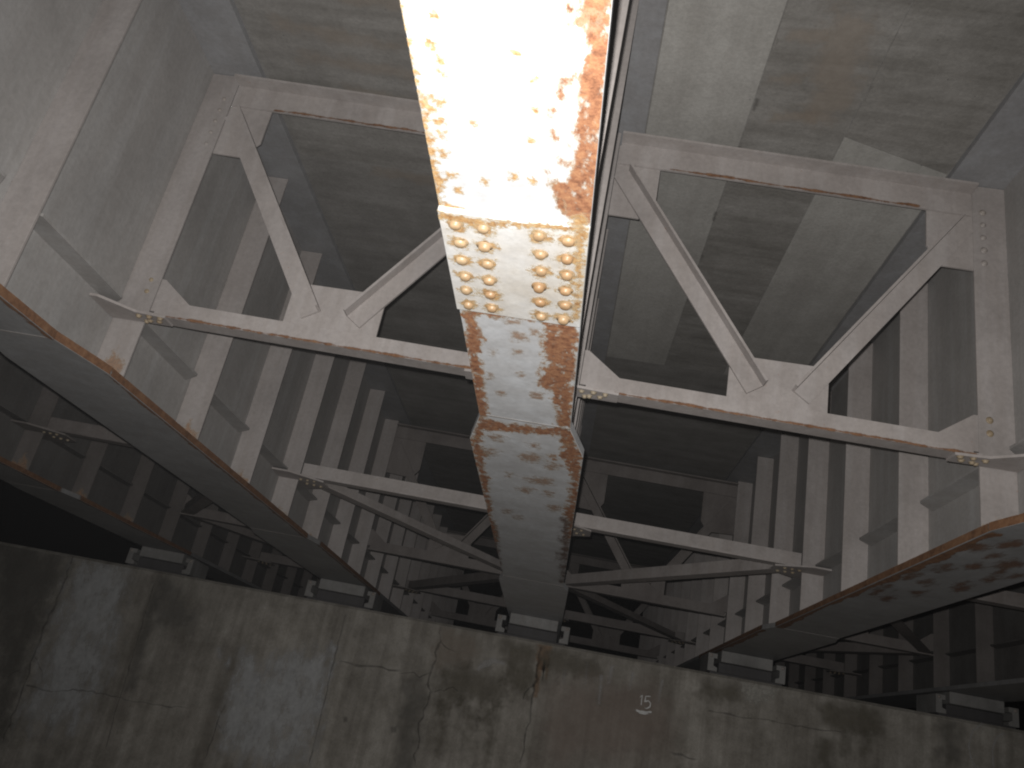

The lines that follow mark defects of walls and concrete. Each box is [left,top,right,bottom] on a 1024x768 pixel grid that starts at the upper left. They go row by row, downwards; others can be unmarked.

rust [166,0,612,583]
rust [699,513,1024,659]